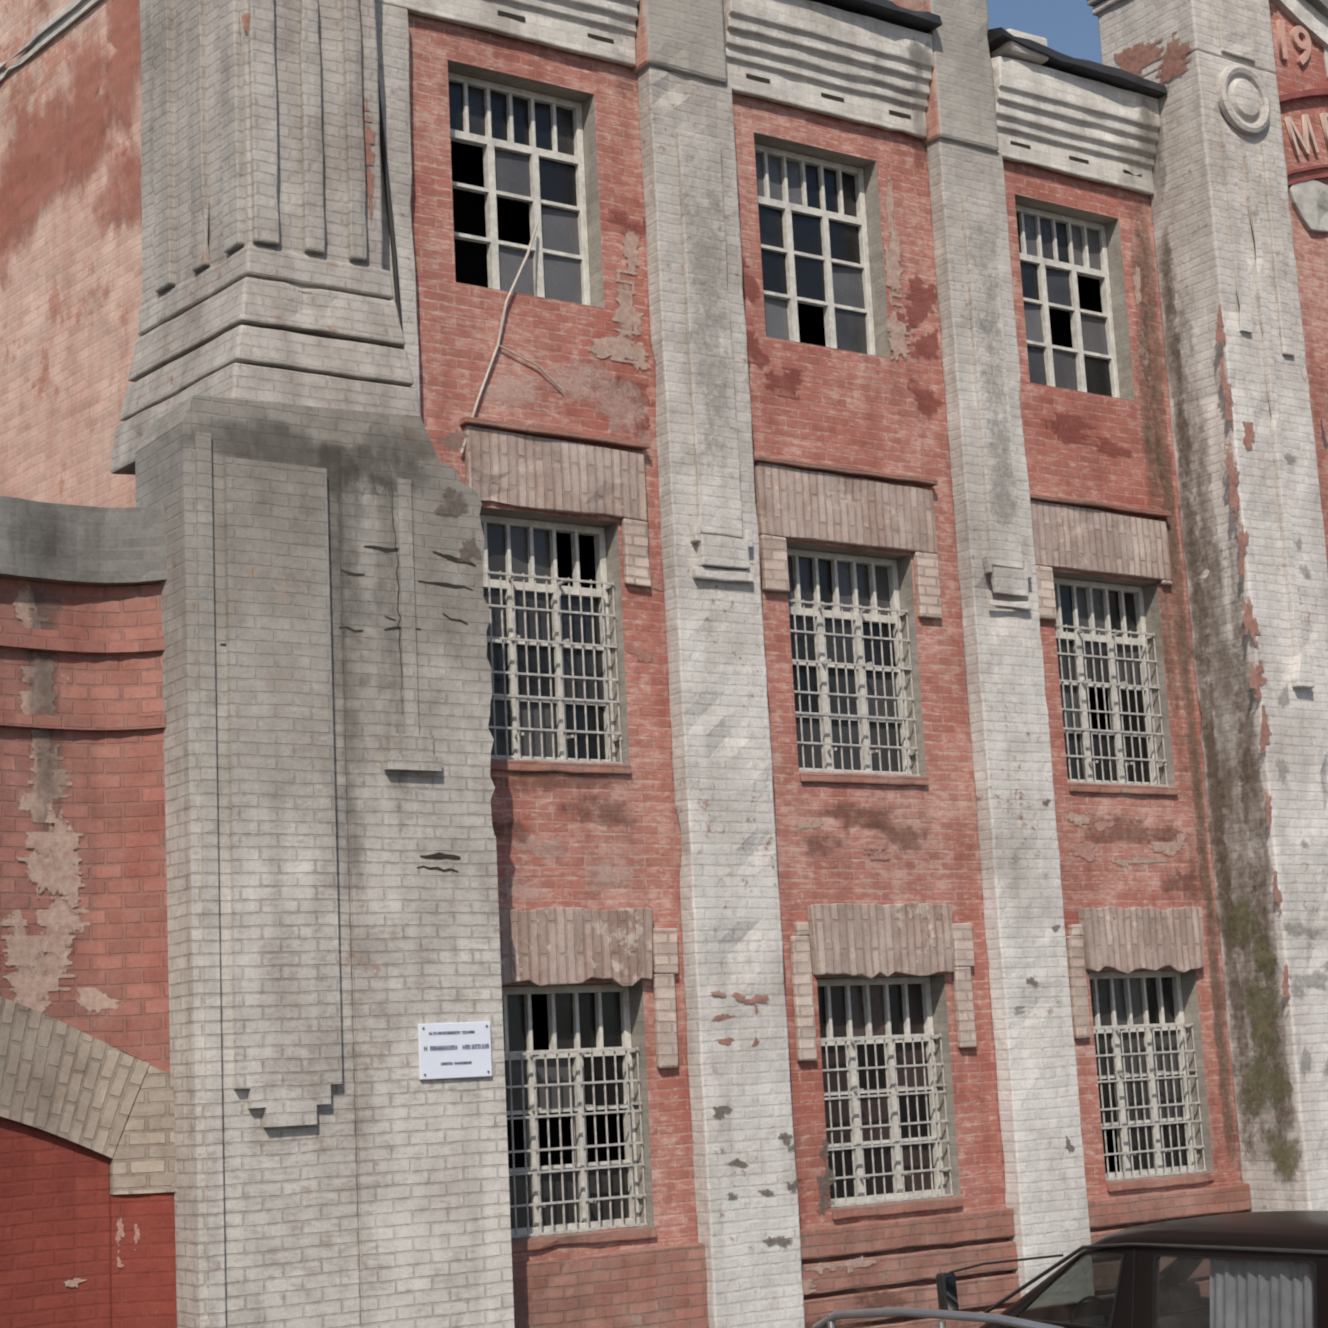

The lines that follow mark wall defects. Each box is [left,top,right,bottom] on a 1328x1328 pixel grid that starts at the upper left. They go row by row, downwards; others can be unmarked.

spalling [586,209,654,440]
spalling [883,168,940,364]
peeling [1215,304,1255,580]
crack [339,469,476,715]
damp [1162,243,1246,1089]
peeling [1241,596,1290,779]
flaking render [0,655,120,1014]
crack [417,852,460,872]
spalling [710,990,770,1021]
damp [1236,655,1328,1126]
spalling [64,1278,87,1288]
peeling [115,1218,140,1268]